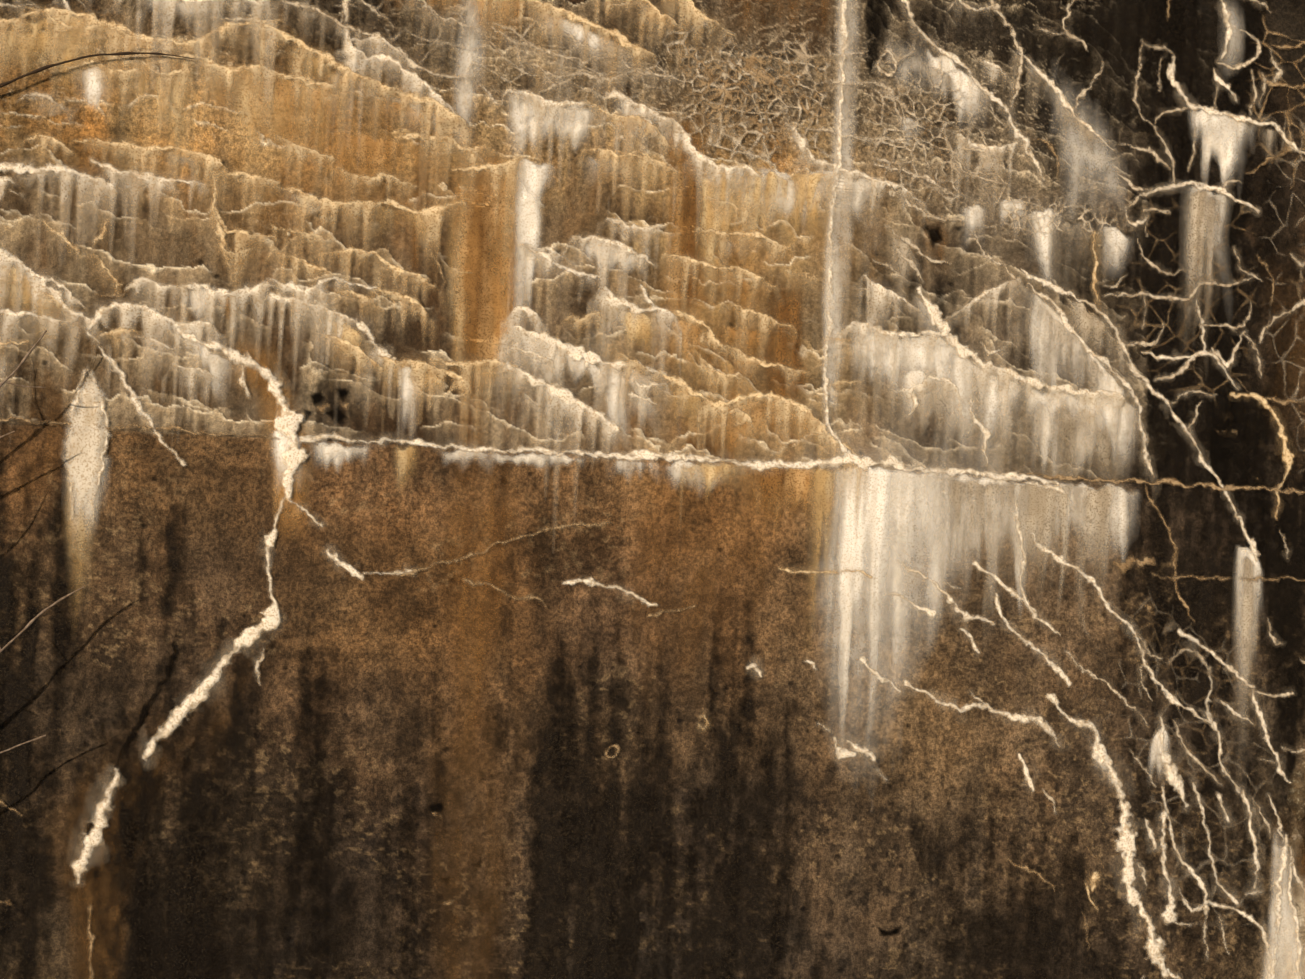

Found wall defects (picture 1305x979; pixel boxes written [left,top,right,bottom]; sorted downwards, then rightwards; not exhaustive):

crack [0,332,223,466]
efflorescence [0,0,546,288]
corrosion [456,161,518,429]
crack [154,0,831,160]
corrosion [669,144,821,301]
corrosion [717,292,809,446]
water stain [268,0,1305,933]
crack [779,0,1305,979]
crack [72,501,695,979]
water stain [478,635,794,979]
water stain [1266,803,1305,979]
spalling [1286,761,1305,822]